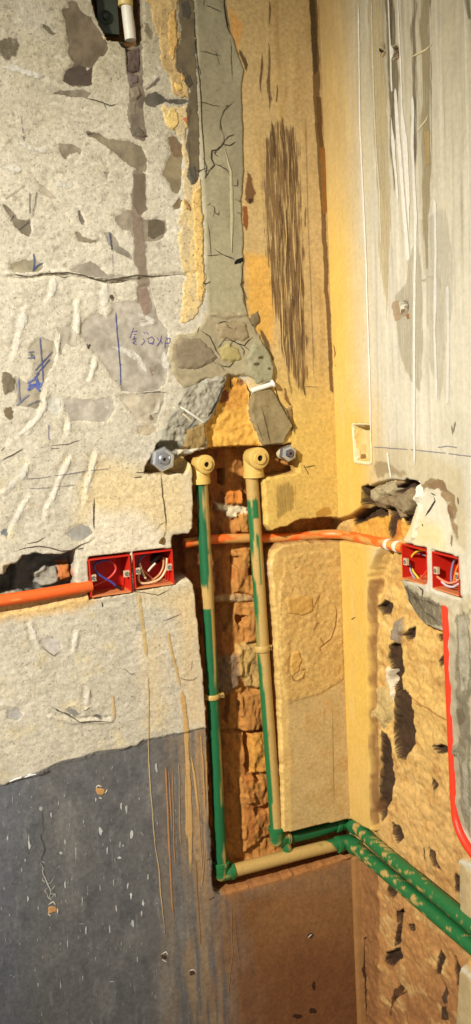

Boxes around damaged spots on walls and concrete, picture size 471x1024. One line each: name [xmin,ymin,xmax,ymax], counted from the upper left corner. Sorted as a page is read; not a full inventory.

flaking render [43,1,125,98]
crack [11,272,211,285]
crack [176,0,293,442]
peeling [259,43,278,108]
flaking render [0,119,408,885]
water stain [147,633,208,943]
flaking render [262,477,471,904]
flaking render [357,861,471,1024]